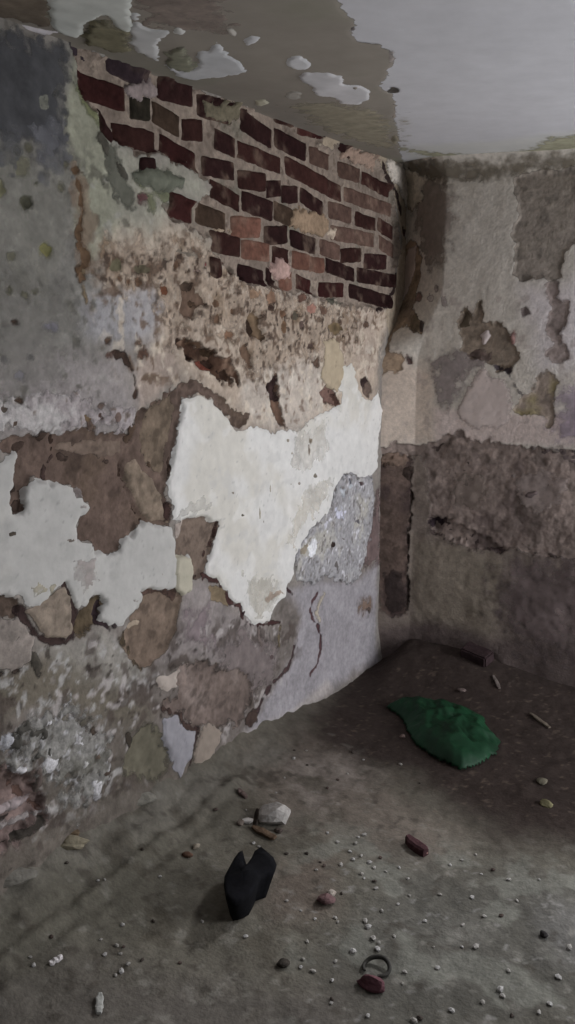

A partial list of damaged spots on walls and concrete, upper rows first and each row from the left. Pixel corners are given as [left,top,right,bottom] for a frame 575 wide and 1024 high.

crack [200,572,325,728]
spalling [0,0,575,670]